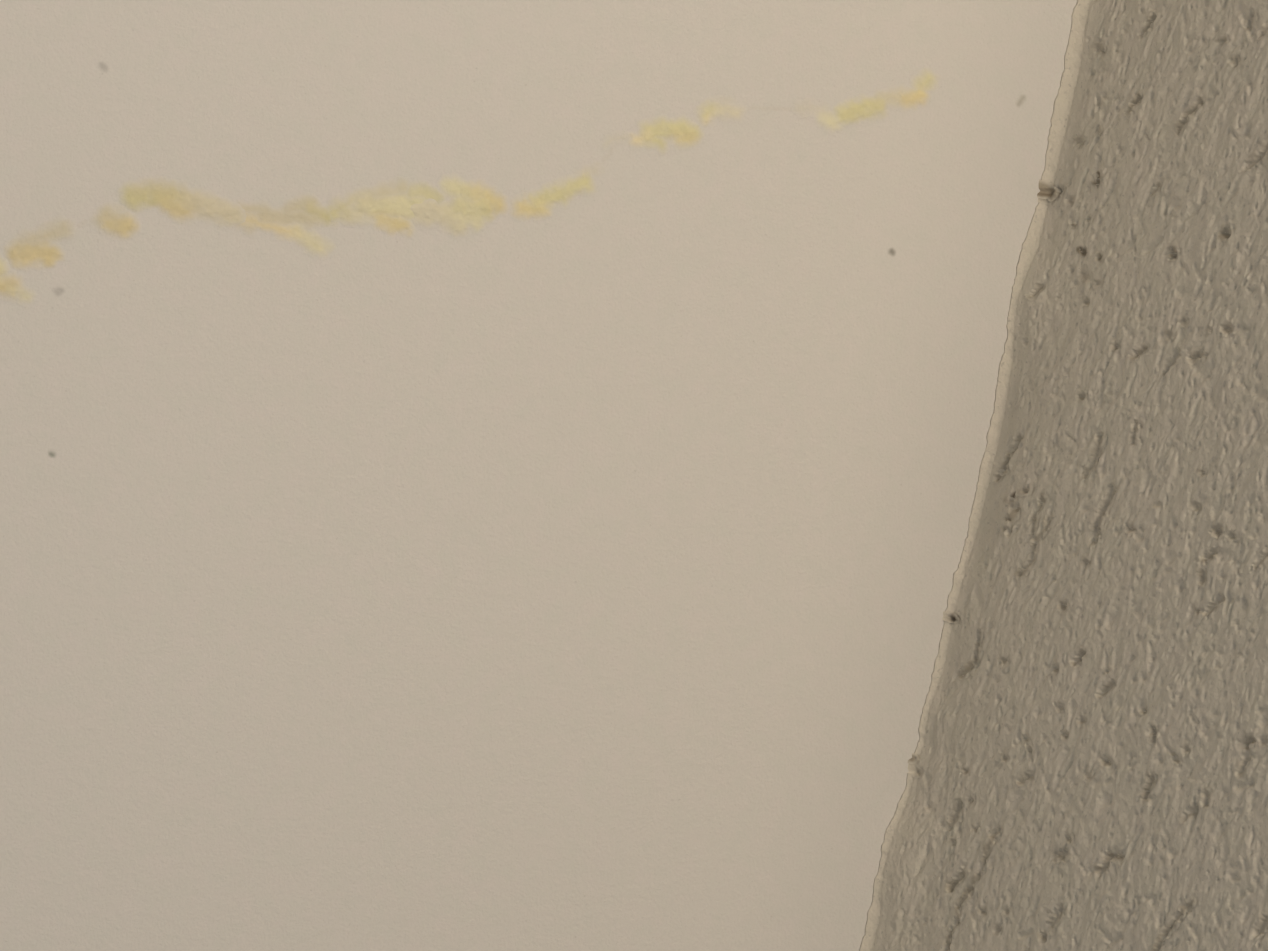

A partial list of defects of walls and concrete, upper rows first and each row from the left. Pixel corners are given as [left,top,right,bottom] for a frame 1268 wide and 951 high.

crack [0,66,942,310]